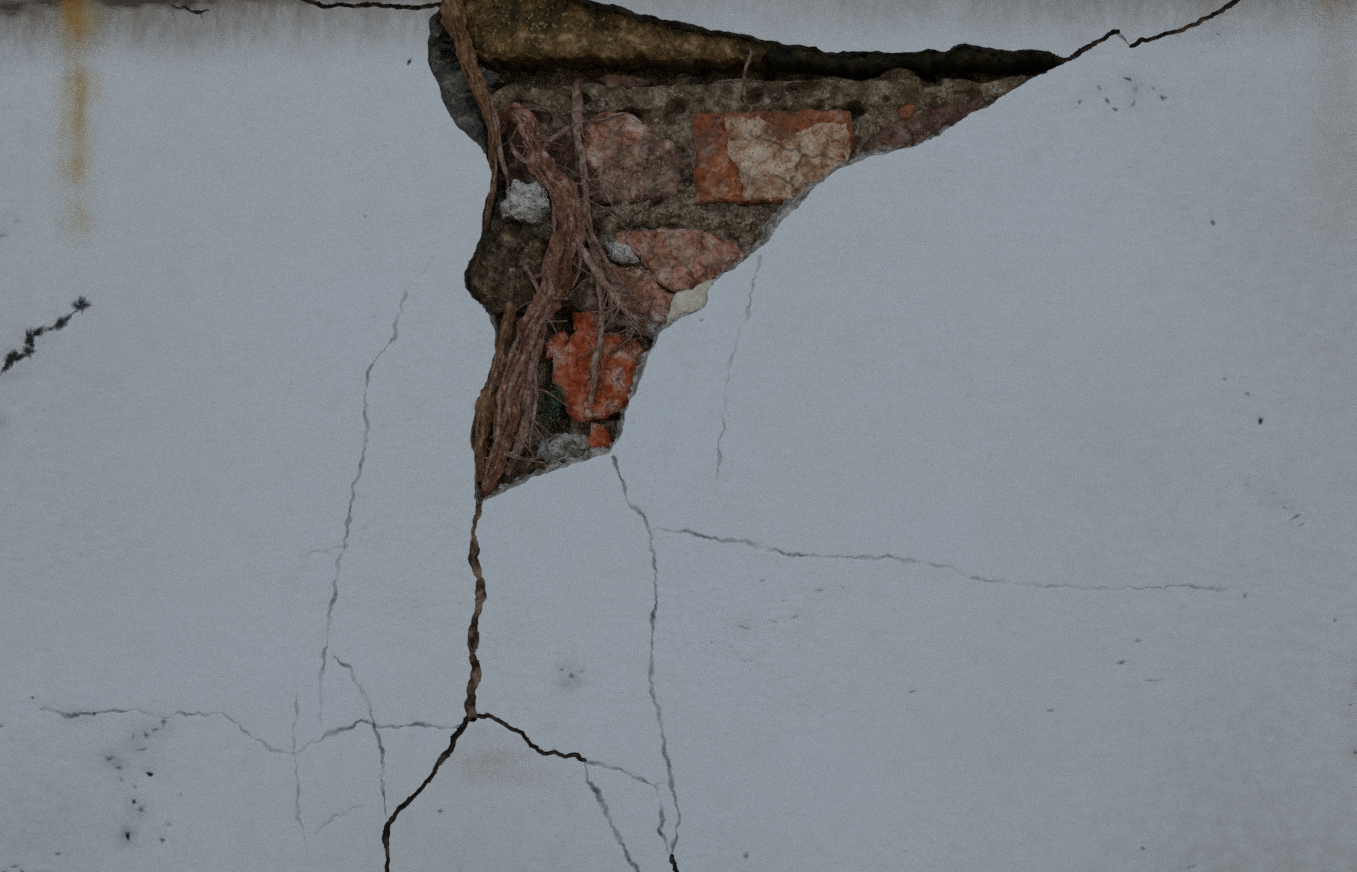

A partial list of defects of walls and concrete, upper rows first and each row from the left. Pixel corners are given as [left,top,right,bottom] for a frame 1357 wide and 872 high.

crack [171,5,209,18]
crack [302,0,441,10]
crack [1060,0,1240,64]
spalling [428,0,1065,506]
crack [382,502,599,872]
crack [645,753,679,872]